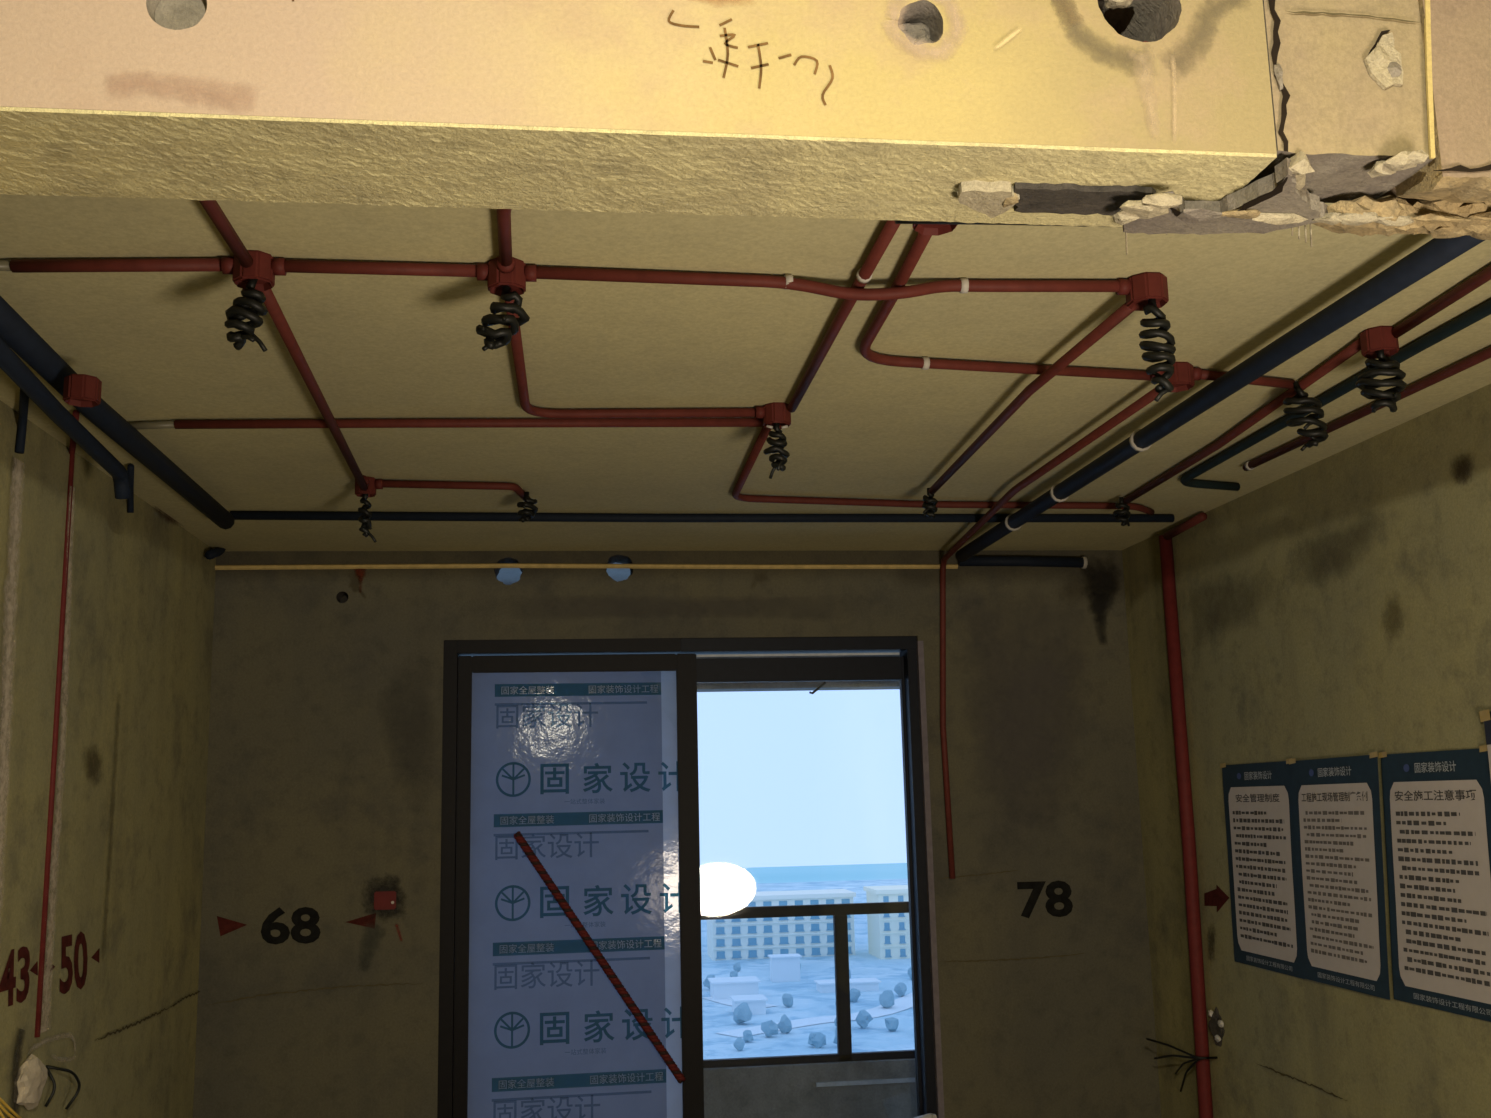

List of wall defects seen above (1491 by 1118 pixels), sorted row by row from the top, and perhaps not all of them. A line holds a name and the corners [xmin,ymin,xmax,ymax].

crack [1231,0,1415,218]
spalling [957,150,1491,240]
water stain [1084,565,1117,642]